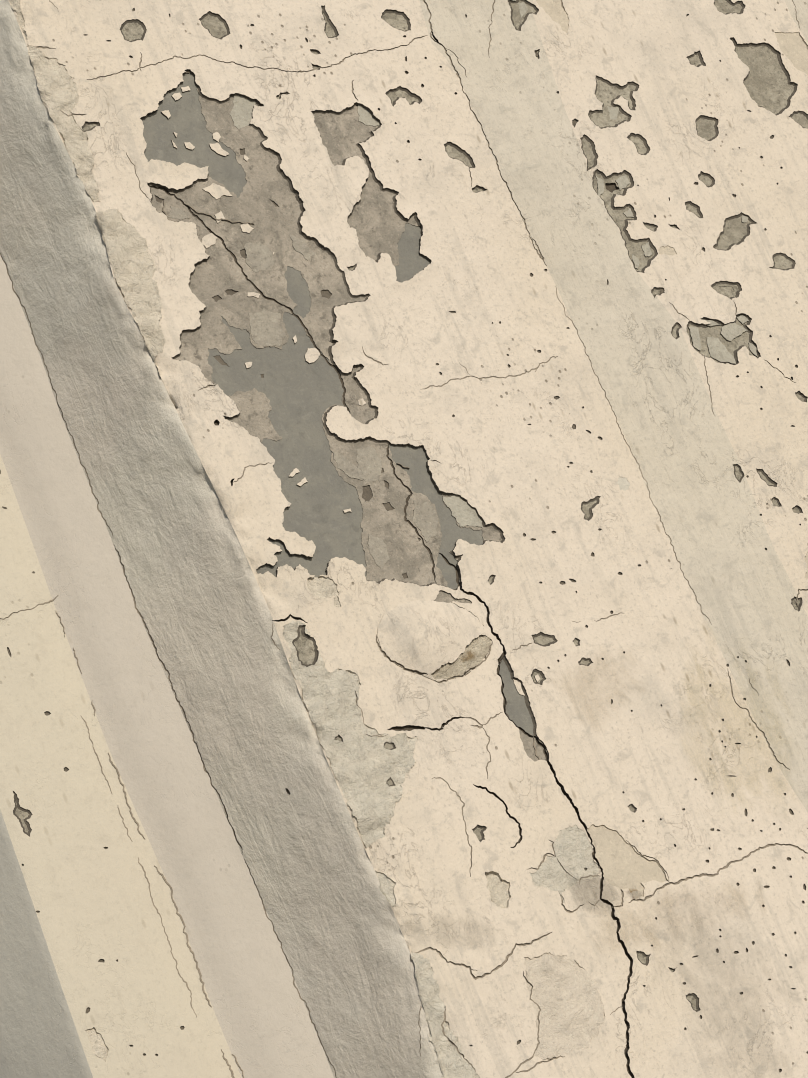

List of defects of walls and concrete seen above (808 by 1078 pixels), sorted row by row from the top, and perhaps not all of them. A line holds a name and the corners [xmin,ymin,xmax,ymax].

spalling [572,75,680,273]
spalling [730,32,808,129]
peeling [9,0,505,608]
crack [87,0,712,625]
spalling [671,313,761,378]
spalling [283,621,418,849]
crack [355,444,808,1078]
peeling [530,824,669,904]
spalling [411,952,480,1078]